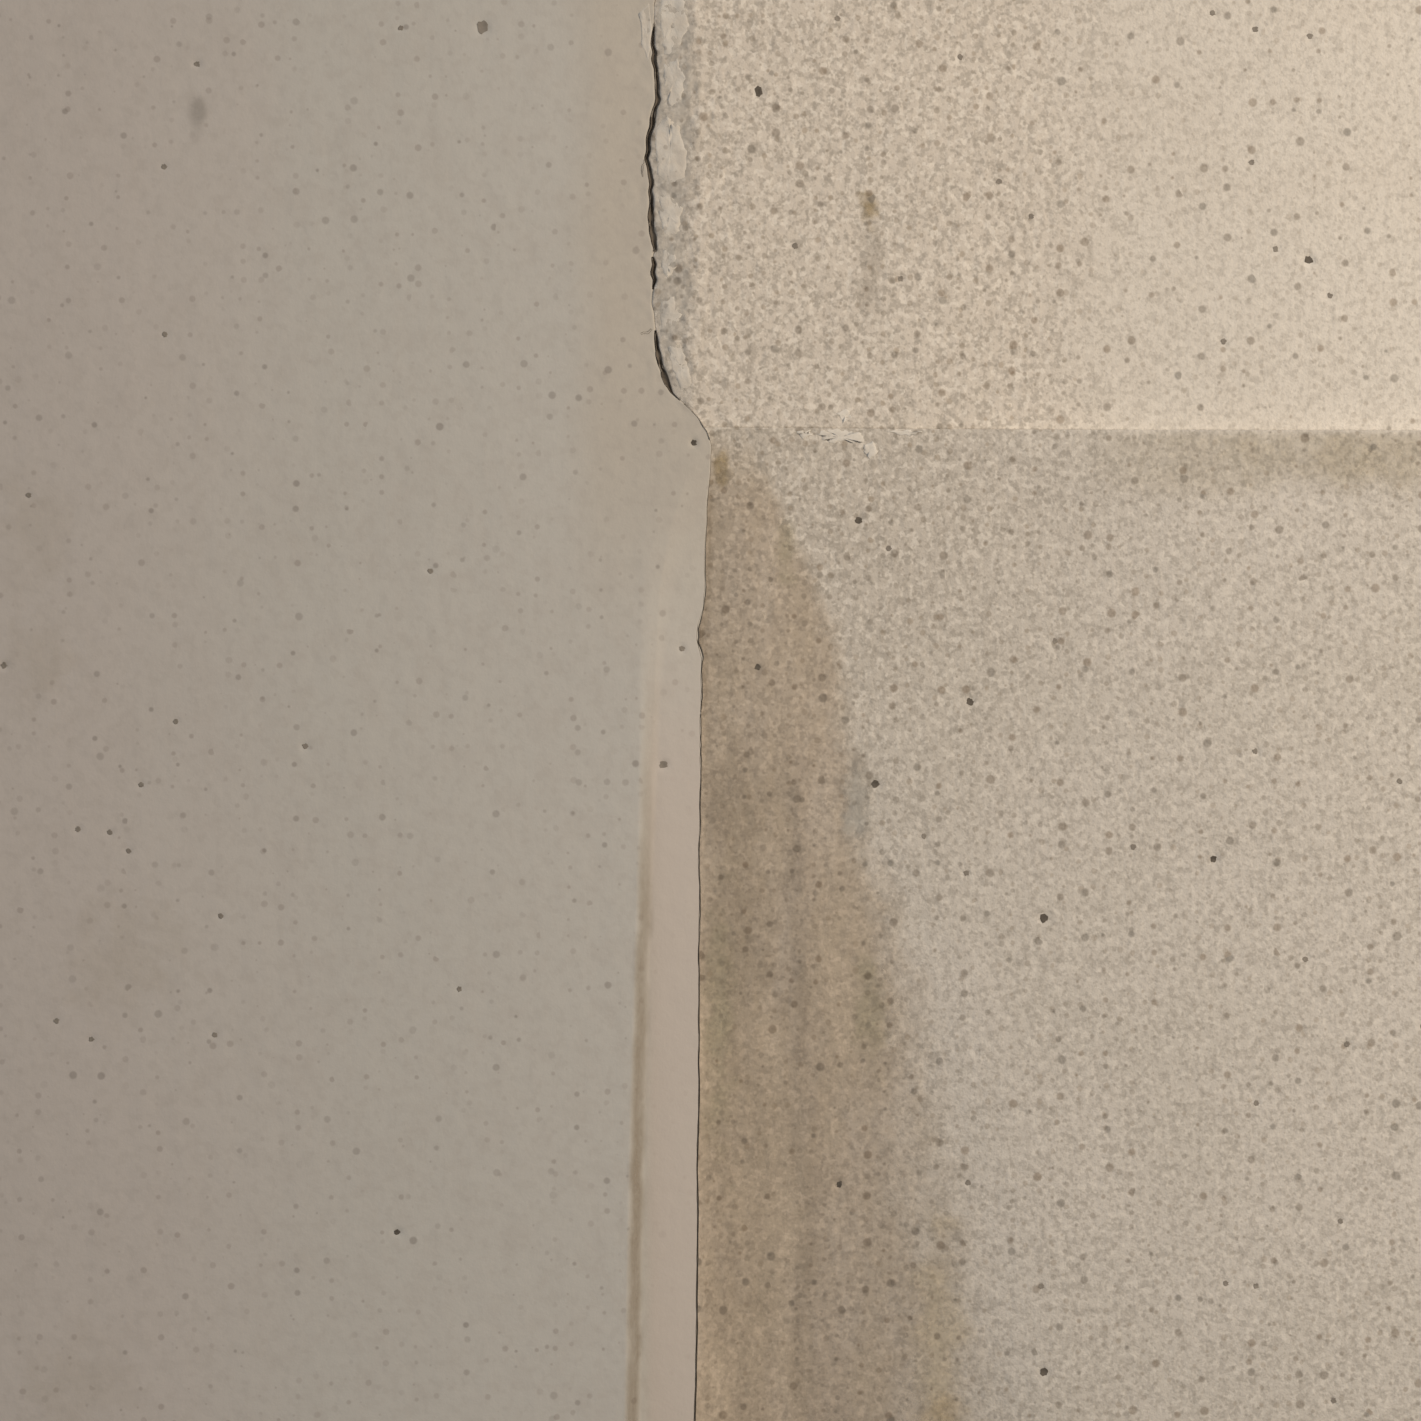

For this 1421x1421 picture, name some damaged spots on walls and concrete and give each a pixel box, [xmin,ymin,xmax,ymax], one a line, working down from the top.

crack [641,27,660,288]
crack [642,331,712,1421]
damp [696,499,916,1421]